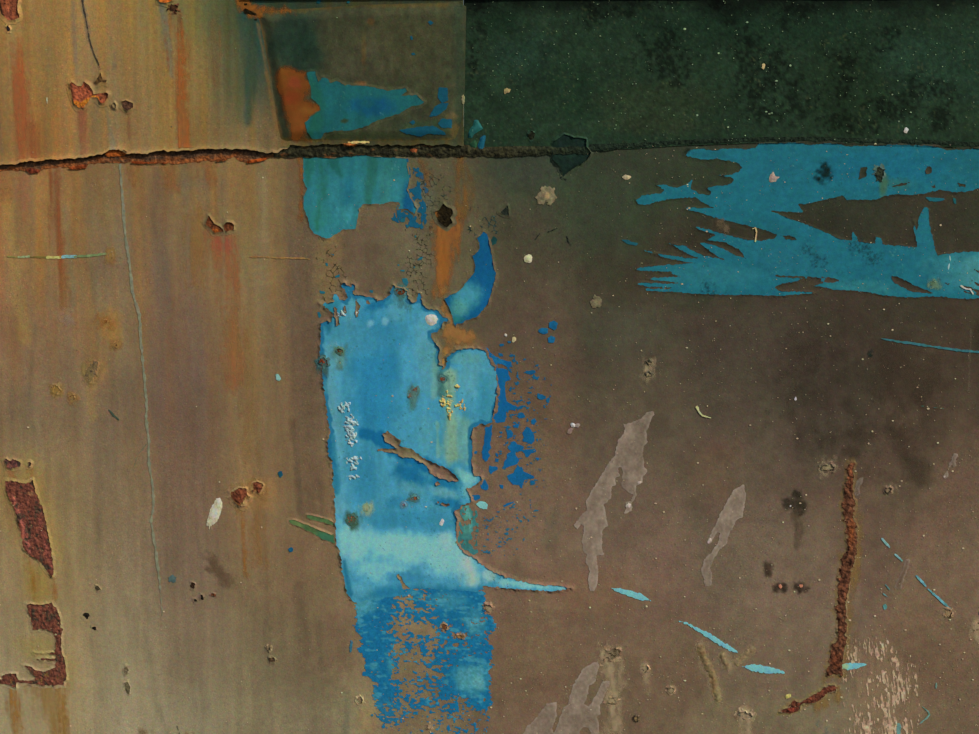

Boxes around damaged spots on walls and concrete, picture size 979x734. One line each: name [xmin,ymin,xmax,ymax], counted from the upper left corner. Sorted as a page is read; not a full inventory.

peeling [299,69,457,242]
peeling [468,120,486,149]
spalling [872,163,886,182]
rust [432,187,475,396]
rust [1,455,57,579]
rust [231,482,263,506]
peeling [314,228,576,734]
rust [777,456,861,717]
rust [0,600,70,732]